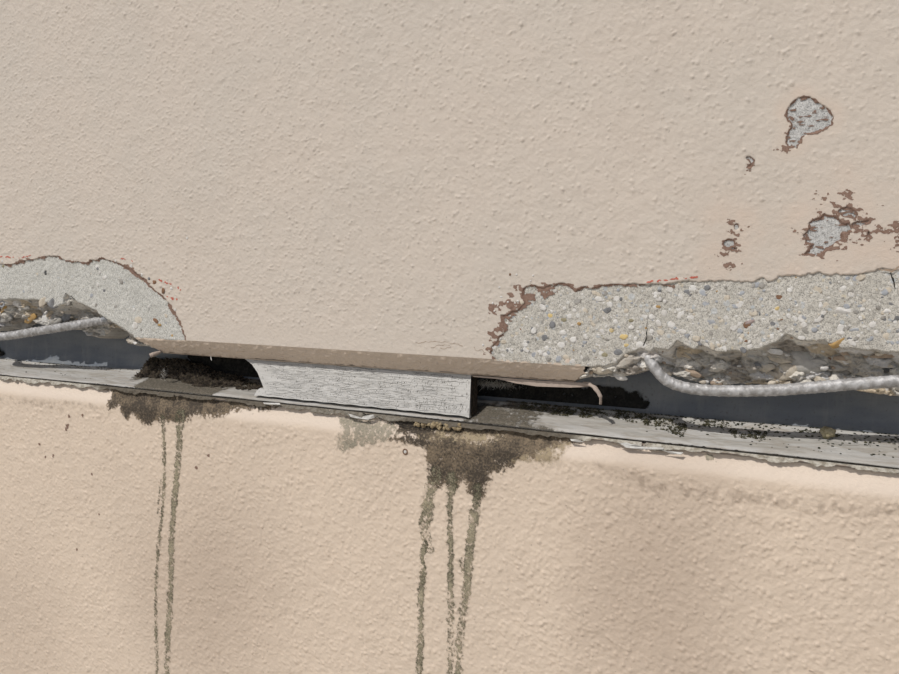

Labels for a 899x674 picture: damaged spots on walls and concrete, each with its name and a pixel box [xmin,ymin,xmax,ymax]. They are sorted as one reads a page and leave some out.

peeling [773,95,833,153]
peeling [792,189,899,261]
spalling [0,256,186,357]
spalling [471,219,899,404]
spalling [0,376,899,474]
leakage [107,389,278,674]
leakage [338,417,573,674]